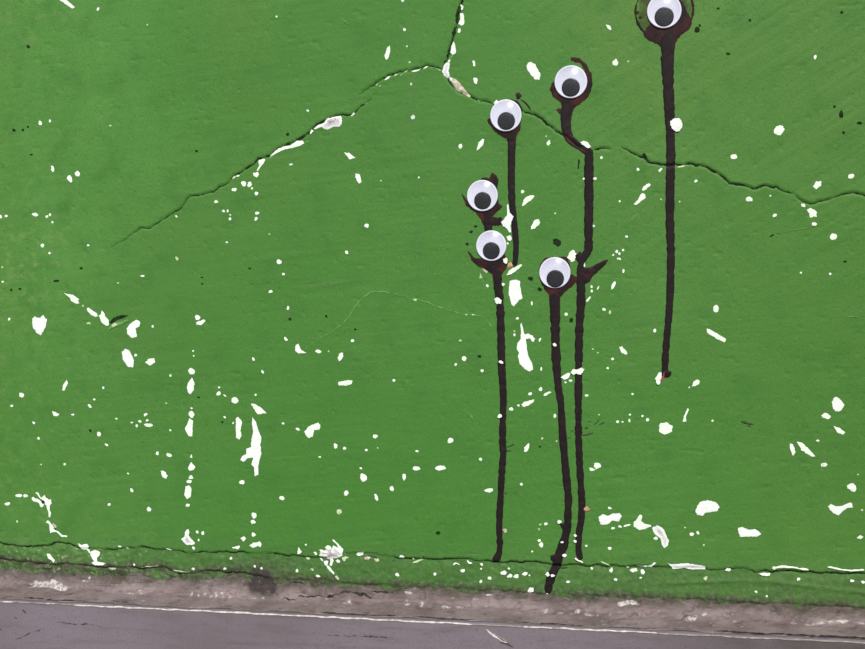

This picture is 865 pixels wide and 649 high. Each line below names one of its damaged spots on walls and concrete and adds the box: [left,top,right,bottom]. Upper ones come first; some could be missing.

crack [112,0,494,247]
crack [594,147,865,204]
peeling [32,315,47,335]
peeling [64,293,140,338]
peeling [517,323,535,371]
peeling [236,404,266,476]
peeling [599,507,669,548]
peeling [696,500,719,516]
crack [0,542,80,565]
crack [134,546,304,574]
crack [395,556,540,564]
crack [707,566,865,574]